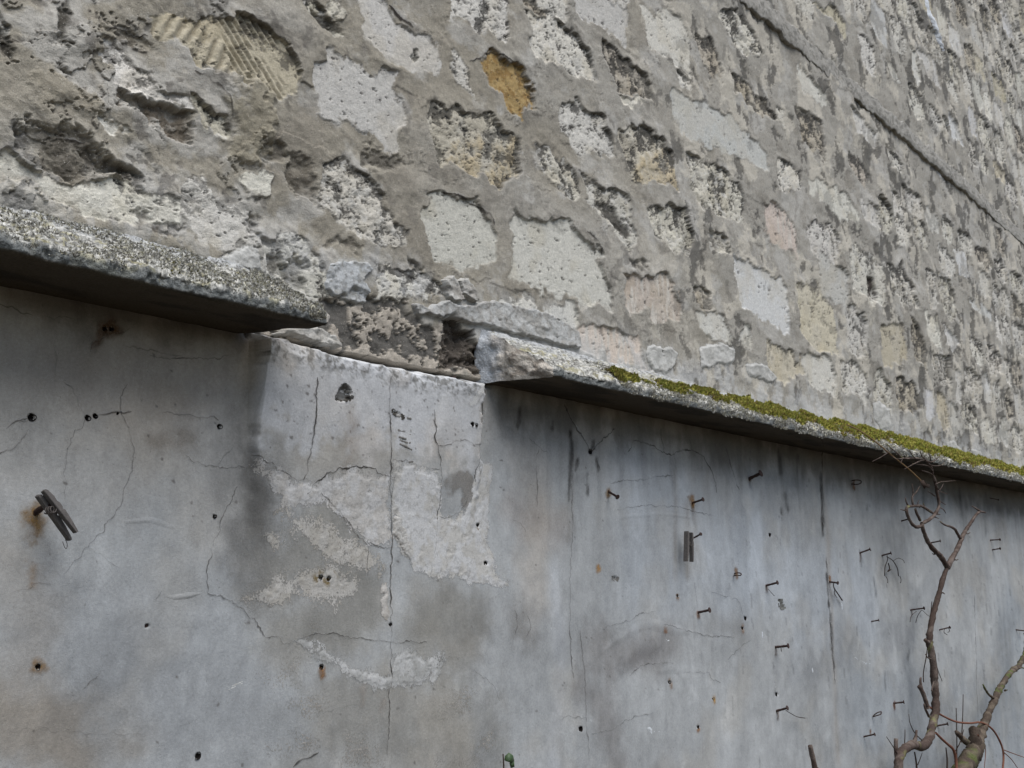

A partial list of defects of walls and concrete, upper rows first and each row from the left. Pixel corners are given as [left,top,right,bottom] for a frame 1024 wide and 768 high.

crack [212,377,403,506]
spalling [335,383,354,402]
crack [434,390,486,465]
crack [344,503,393,614]
peeling [240,457,509,620]
crack [310,632,426,732]
peeling [294,637,448,693]